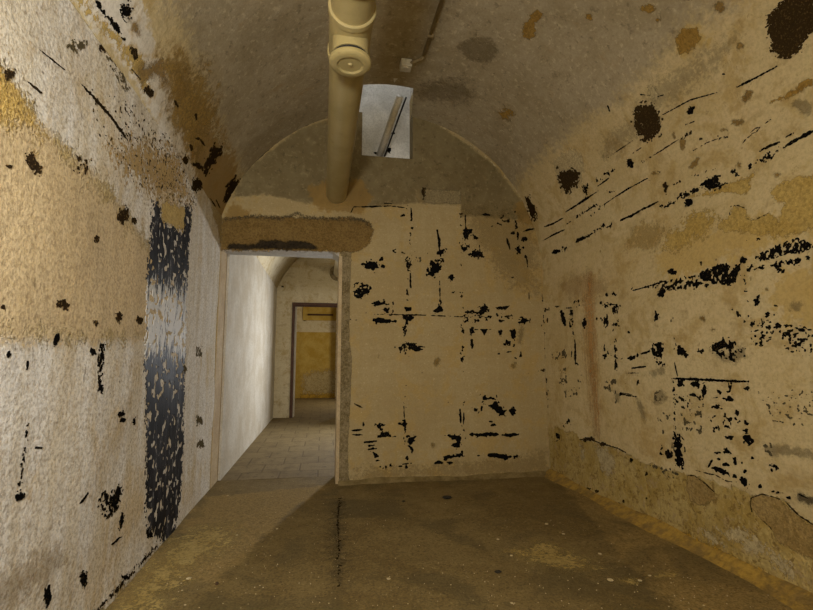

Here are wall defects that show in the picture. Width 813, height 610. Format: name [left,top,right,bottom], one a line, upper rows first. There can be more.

peeling [459,215,485,259]
peeling [482,211,534,267]
peeling [551,150,589,192]
damp [543,130,813,254]
peeling [662,173,813,254]
peeling [353,229,463,353]
damp [143,197,193,544]
peeling [460,304,531,362]
peeling [351,406,416,469]
peeling [434,394,519,465]
spalling [543,291,813,580]
crack [334,498,342,587]